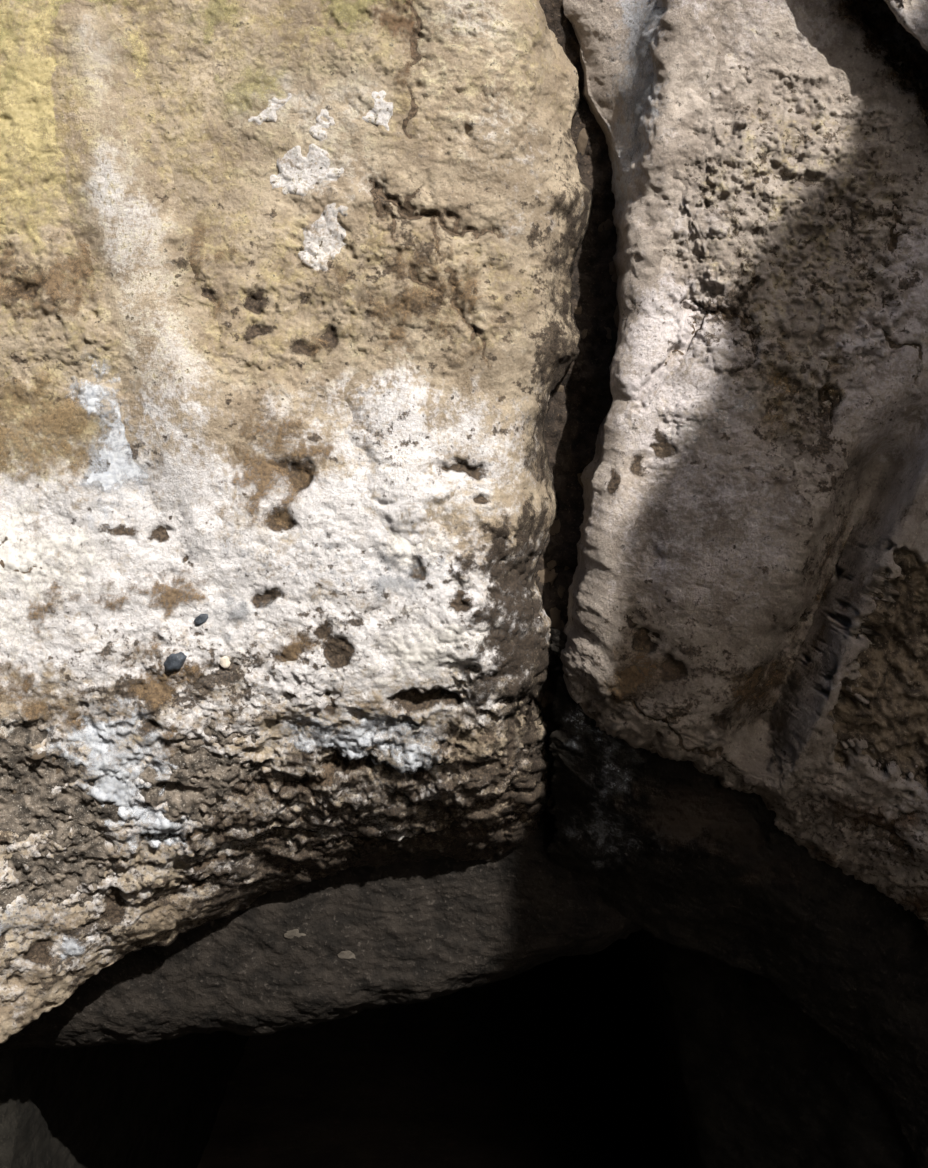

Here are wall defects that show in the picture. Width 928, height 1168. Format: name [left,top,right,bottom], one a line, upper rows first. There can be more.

water stain [605,630,681,700]
spalling [828,549,928,794]